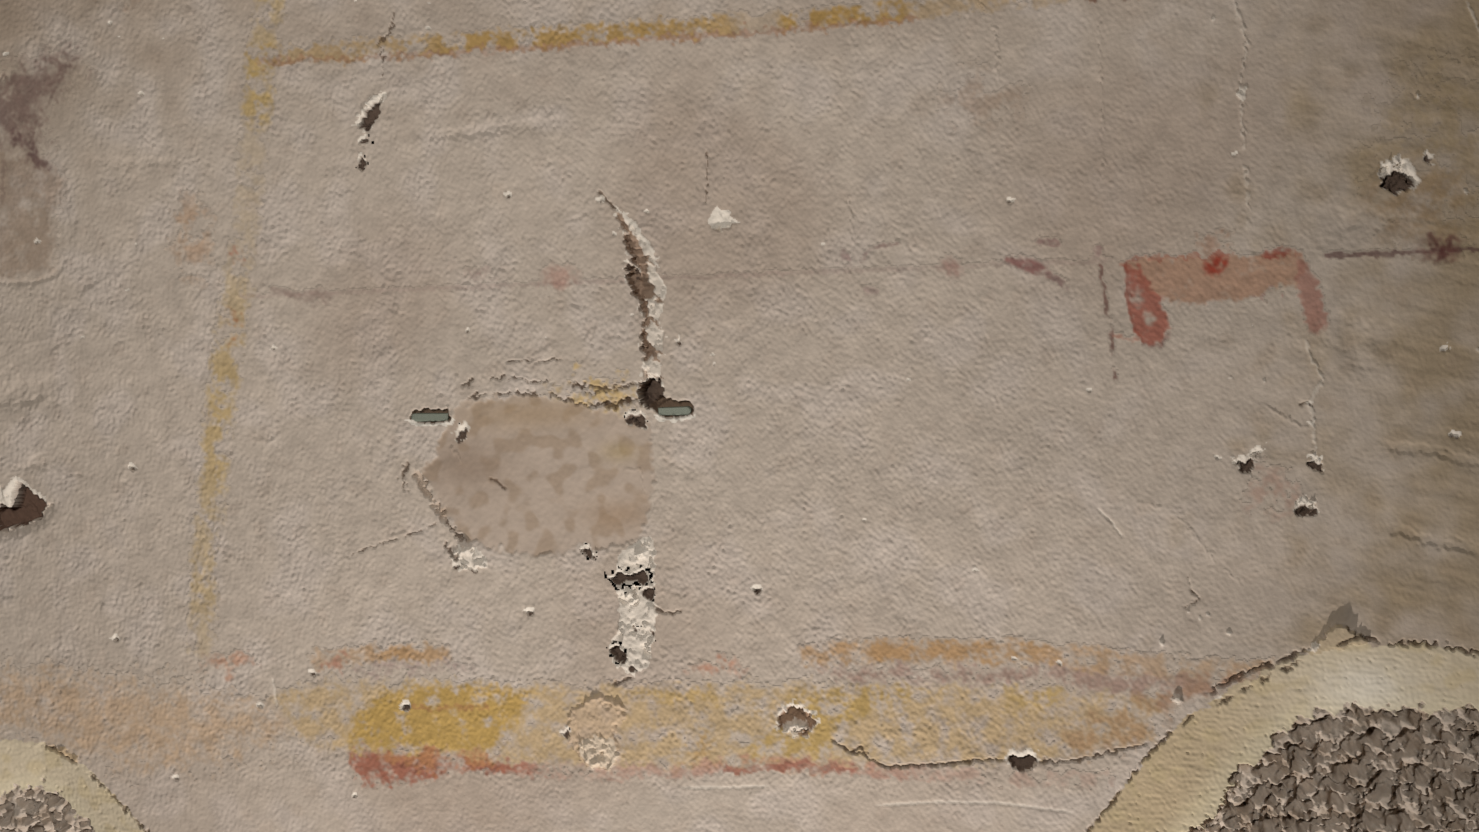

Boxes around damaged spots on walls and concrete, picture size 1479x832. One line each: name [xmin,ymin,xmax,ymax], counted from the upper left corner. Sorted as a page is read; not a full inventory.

peeling [456,423,469,443]
peeling [625,410,647,428]
flaking render [443,540,488,574]
peeling [580,544,597,559]
crack [607,535,683,687]
crack [831,633,1479,832]